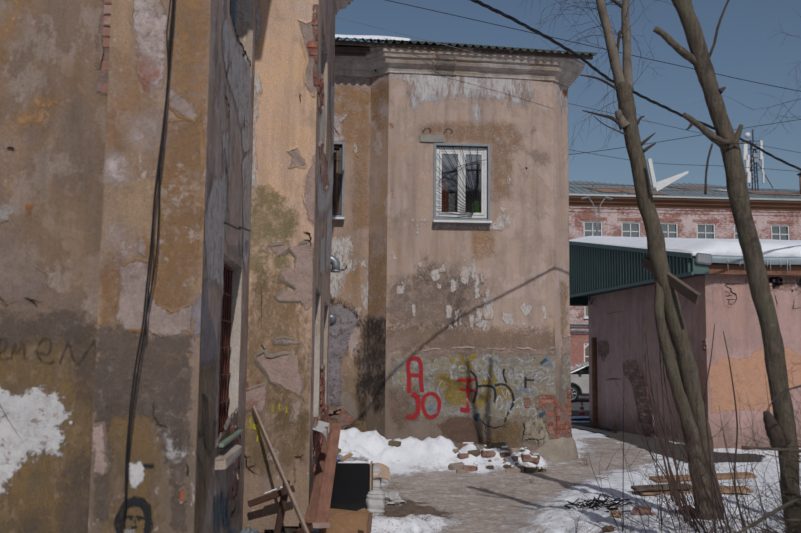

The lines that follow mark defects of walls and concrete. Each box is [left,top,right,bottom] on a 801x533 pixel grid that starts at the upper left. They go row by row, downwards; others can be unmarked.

flaking render [93,0,112,96]
peeling [222,19,263,277]
peeling [424,124,520,196]
peeling [411,206,569,335]
flaking render [214,336,304,452]
damp [330,296,555,432]
flaking render [522,387,572,446]